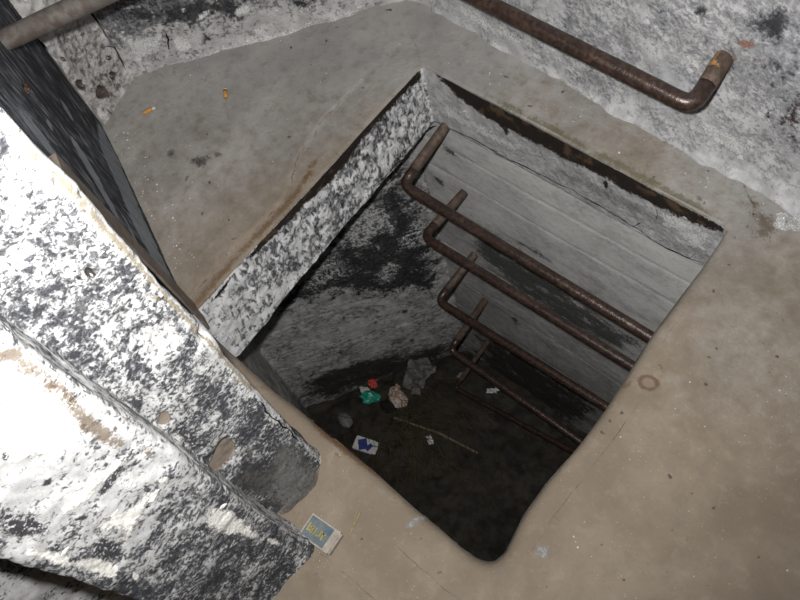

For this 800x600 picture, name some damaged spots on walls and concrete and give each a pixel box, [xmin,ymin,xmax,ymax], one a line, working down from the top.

water stain [250,71,421,257]
crack [375,126,702,263]
peeling [125,394,144,413]
peeling [158,411,200,458]
spalling [209,438,235,472]